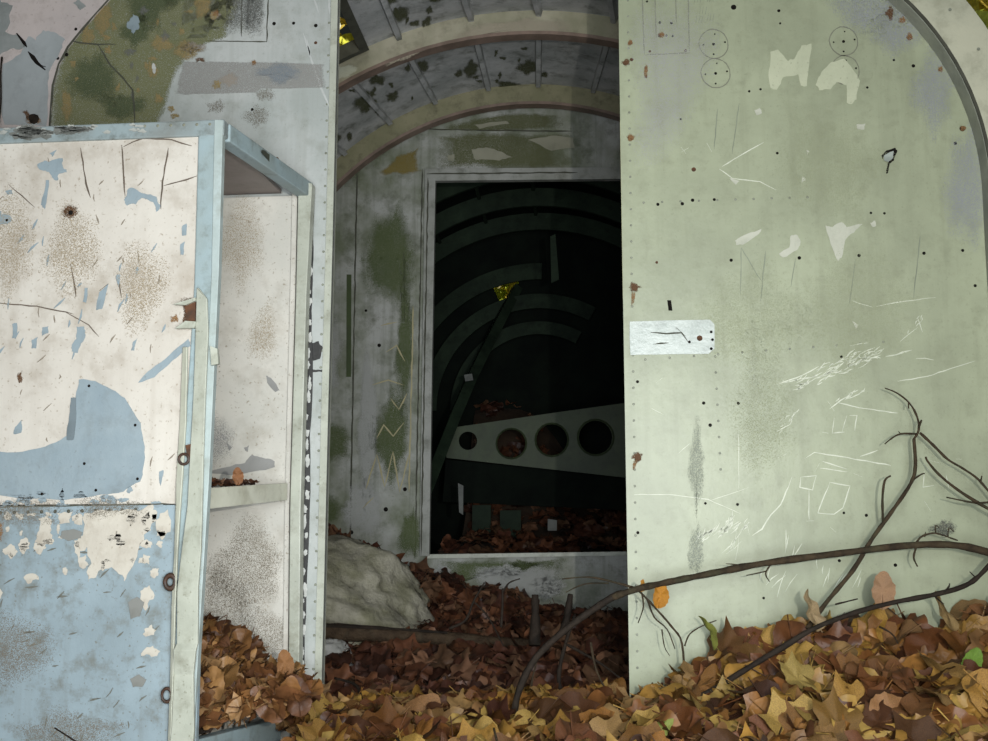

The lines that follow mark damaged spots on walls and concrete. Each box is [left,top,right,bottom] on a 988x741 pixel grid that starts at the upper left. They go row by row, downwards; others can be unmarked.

damp [179,0,266,53]
peeling [0,0,110,141]
peeling [768,43,860,104]
peeling [37,150,67,209]
peeling [124,188,160,212]
damp [380,148,420,176]
damp [437,113,572,168]
peeling [825,221,876,261]
peeling [71,327,86,353]
peeling [138,339,190,383]
peeling [0,379,171,619]
peeling [141,625,160,657]